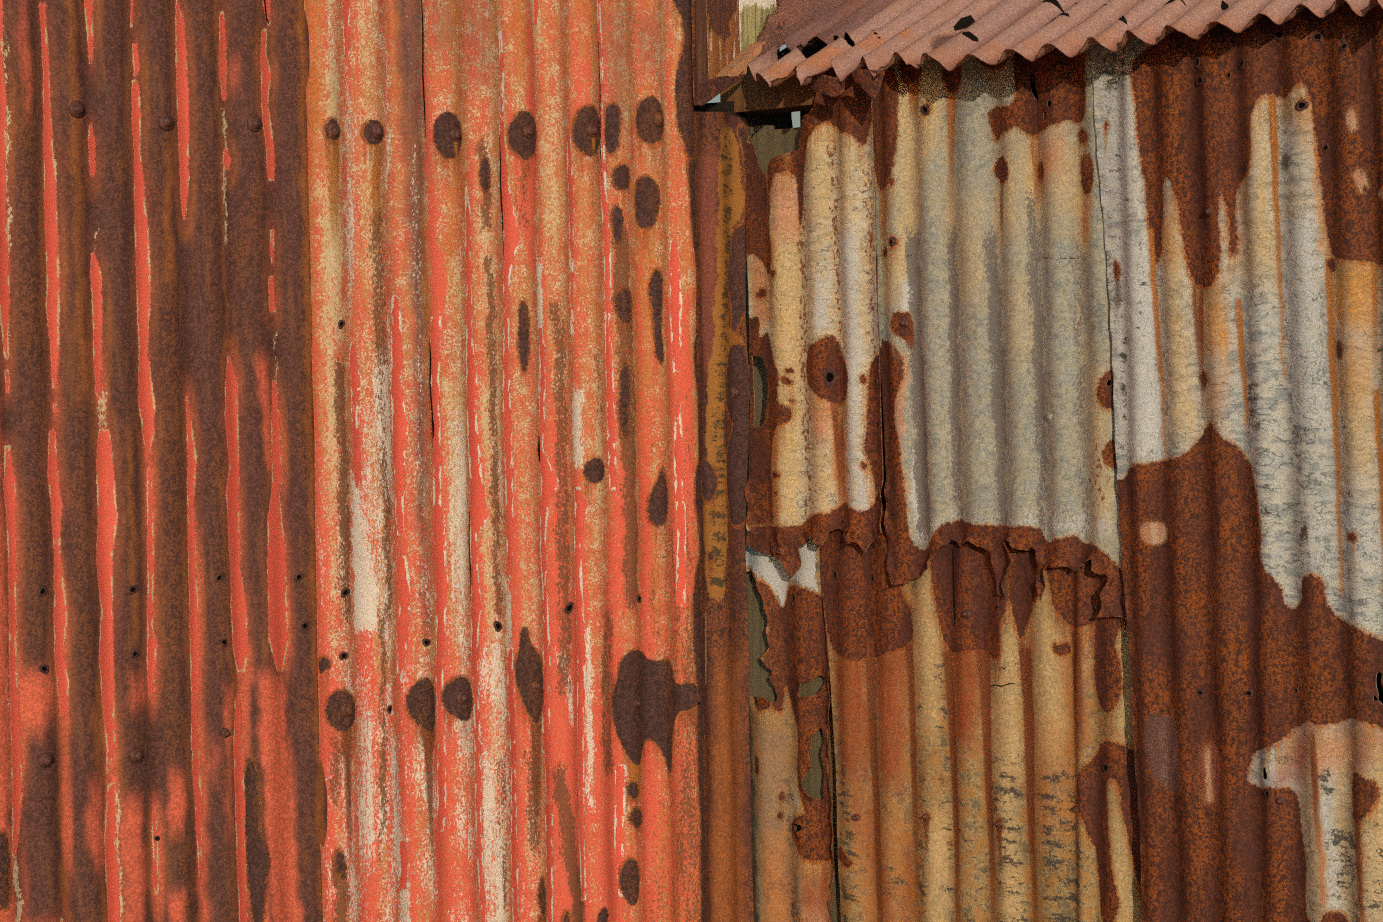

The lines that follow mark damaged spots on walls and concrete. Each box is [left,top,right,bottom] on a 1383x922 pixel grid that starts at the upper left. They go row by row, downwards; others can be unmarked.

rust [507,111,538,161]
rust [572,0,697,264]
peeling [1346,108,1357,132]
peeling [1354,169,1368,193]
rust [694,2,1383,922]
rust [610,551,715,922]
rust [0,831,13,911]
rust [244,758,271,922]